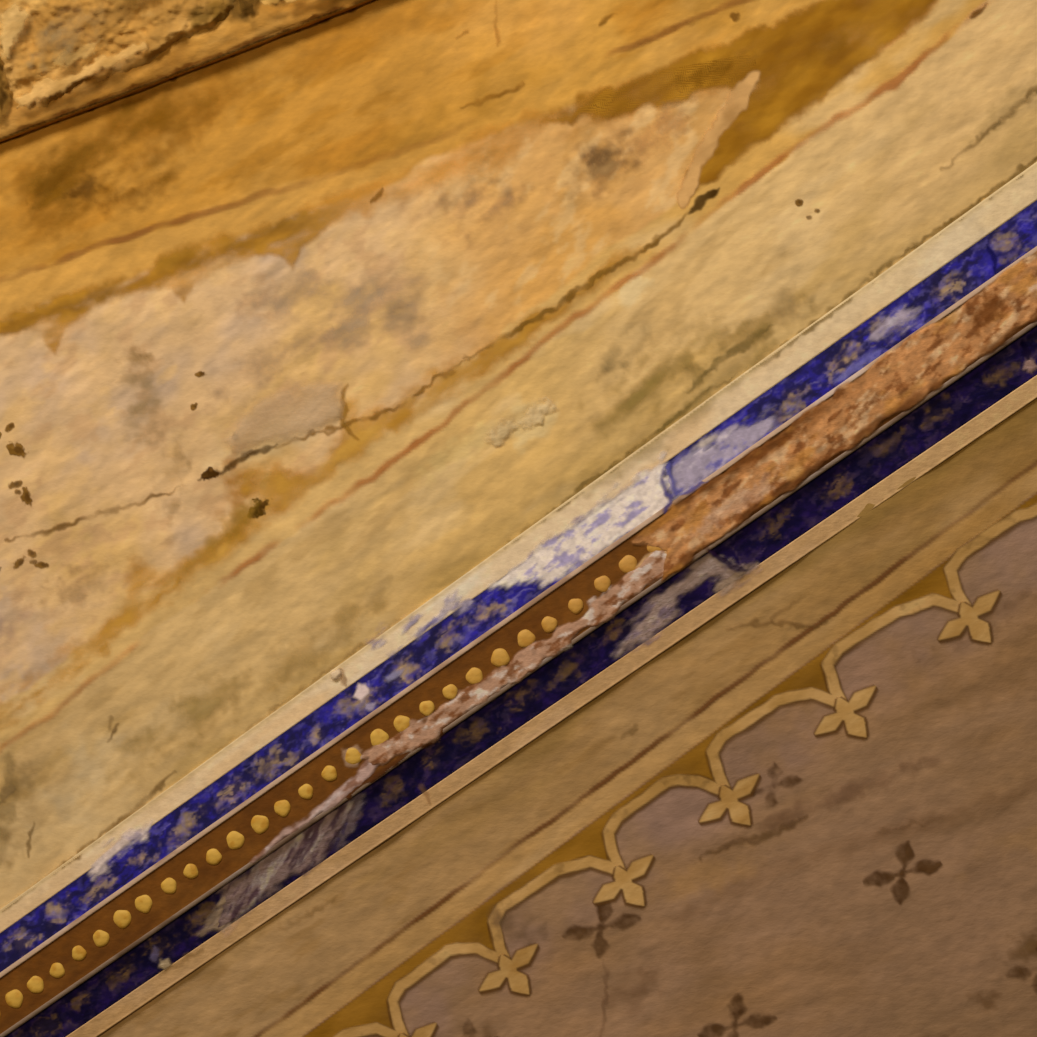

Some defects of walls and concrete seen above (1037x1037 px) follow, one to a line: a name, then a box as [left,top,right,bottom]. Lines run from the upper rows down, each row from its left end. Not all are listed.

leakage [27,145,112,208]
crack [915,157,1037,247]
crack [509,189,719,336]
spalling [0,423,25,457]
crack [201,447,270,478]
crack [303,388,393,440]
crack [567,343,748,503]
spalling [9,481,32,505]
crack [43,518,81,533]
spalling [14,549,48,568]
peeling [202,252,1037,934]
peeling [150,947,171,969]